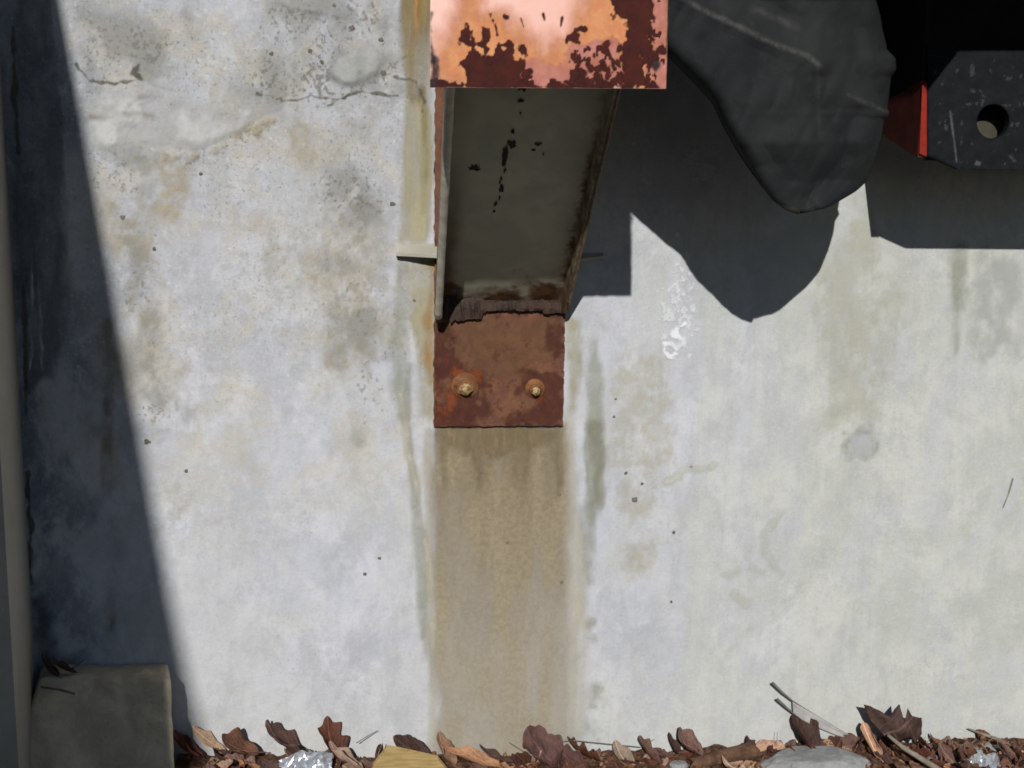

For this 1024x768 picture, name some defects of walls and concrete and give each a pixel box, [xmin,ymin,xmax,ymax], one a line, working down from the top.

crack [75,62,141,85]
crack [256,75,426,105]
rust [402,0,667,242]
water stain [658,255,699,359]
rust [411,259,489,426]
rust [547,326,564,356]
rust [506,370,563,426]